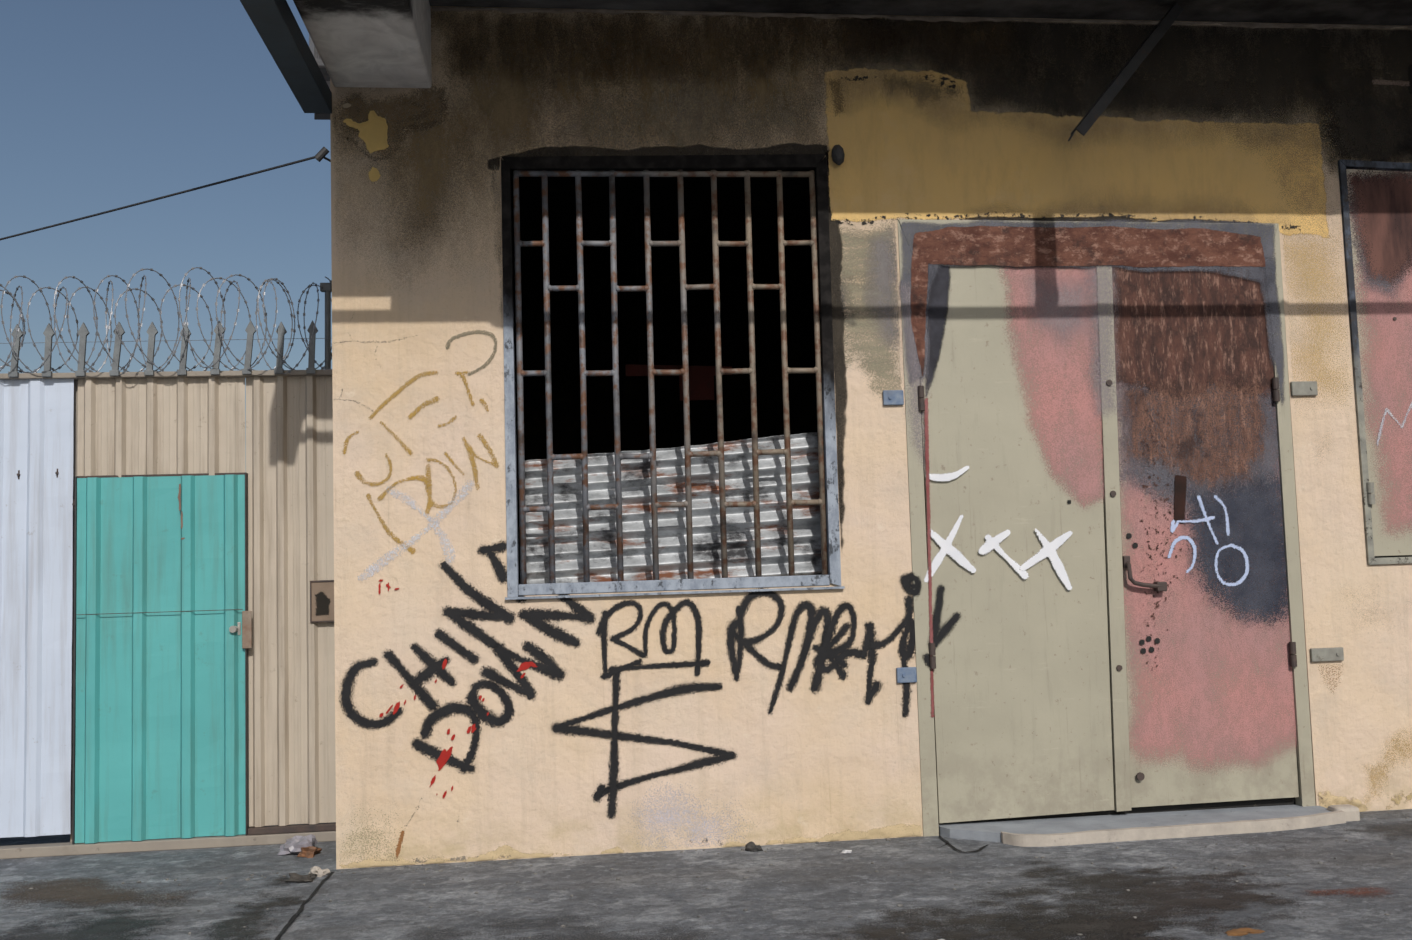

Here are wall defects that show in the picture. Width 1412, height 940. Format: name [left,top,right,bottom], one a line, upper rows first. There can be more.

damp [451,15,1010,85]
damp [340,86,449,161]